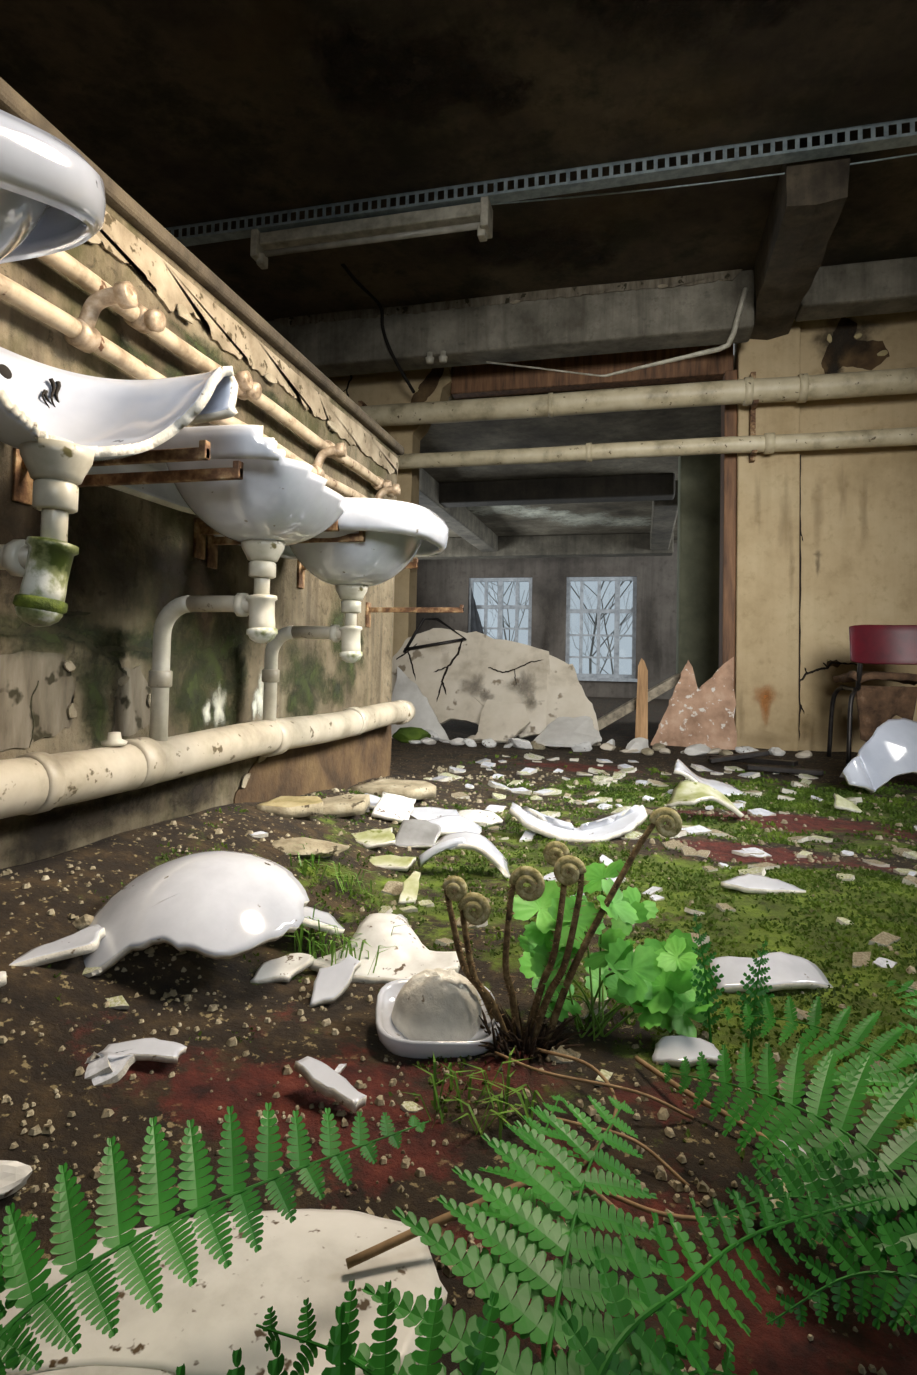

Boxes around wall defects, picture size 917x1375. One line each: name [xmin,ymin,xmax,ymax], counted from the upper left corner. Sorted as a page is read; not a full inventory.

flaking render [87,211,398,475]
flaking render [821,317,890,374]
peeling [0,650,77,751]